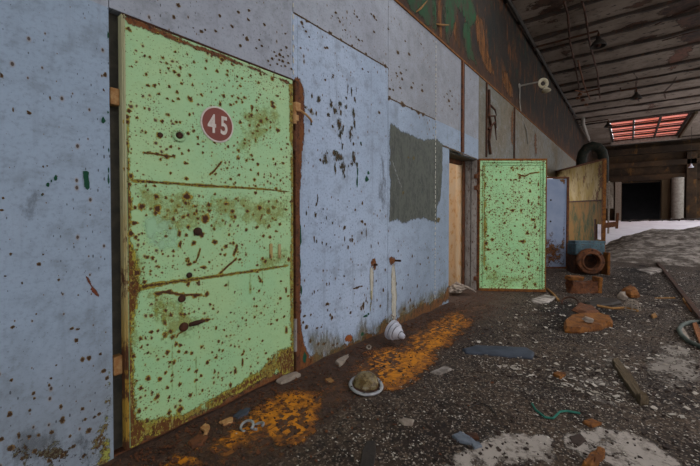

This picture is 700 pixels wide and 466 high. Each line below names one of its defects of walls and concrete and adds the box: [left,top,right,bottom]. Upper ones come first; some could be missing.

rust [123,16,492,466]
peeling [389,123,443,223]
rust [478,133,565,292]
leakage [310,256,446,360]
rust [0,400,110,466]